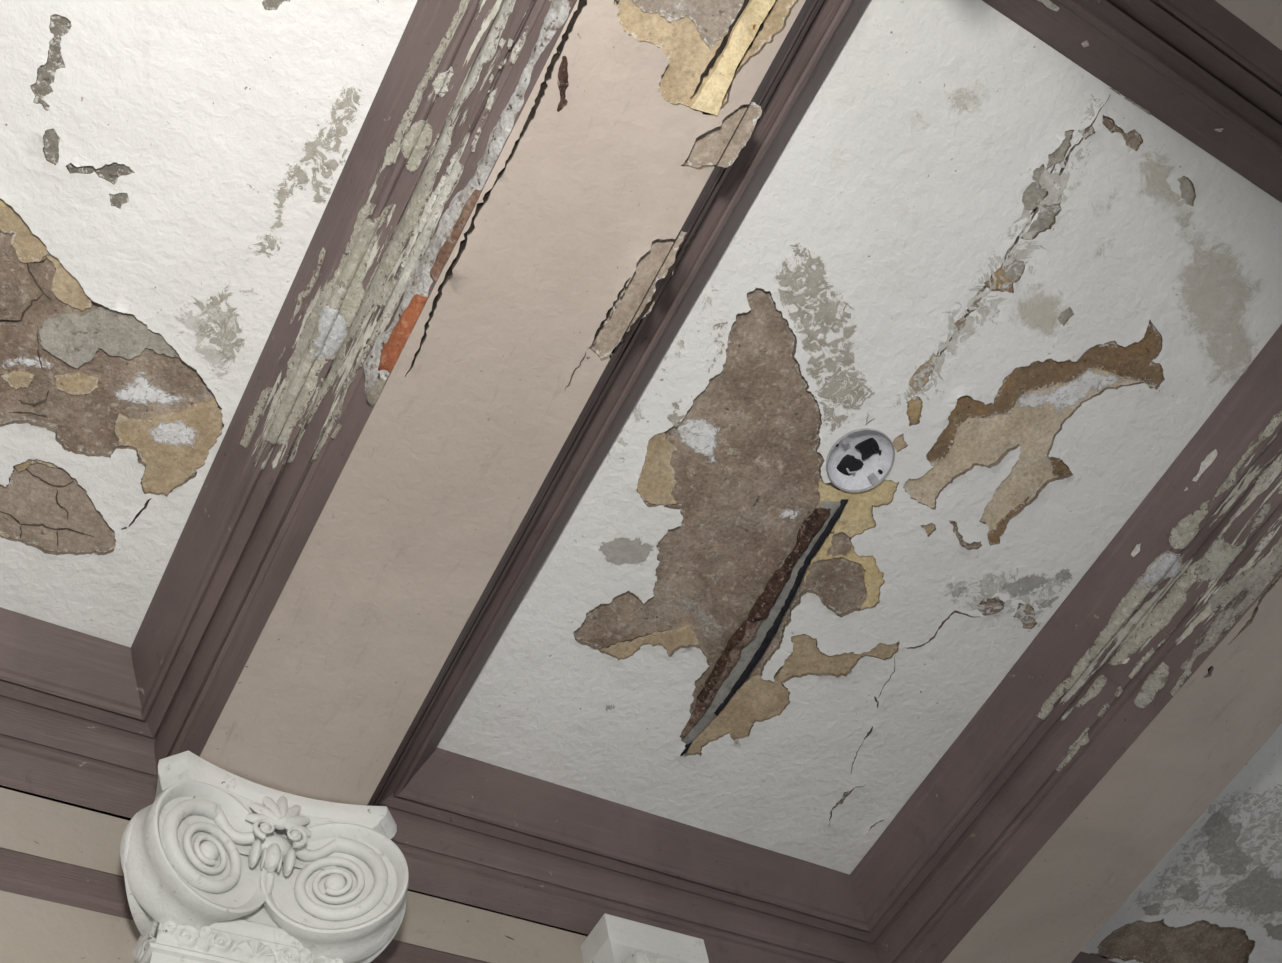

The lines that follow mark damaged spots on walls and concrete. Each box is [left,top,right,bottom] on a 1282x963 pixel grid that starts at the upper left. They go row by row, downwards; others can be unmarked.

peeling [31,14,71,110]
peeling [44,129,134,208]
peeling [239,0,575,470]
flaking render [614,0,796,168]
flaking render [0,459,116,553]
flaking render [0,198,264,494]
rust [680,507,831,738]
flaking render [574,88,1163,754]
peeling [1036,410,1282,772]
crack [830,655,896,813]
peeling [1090,785,1282,963]